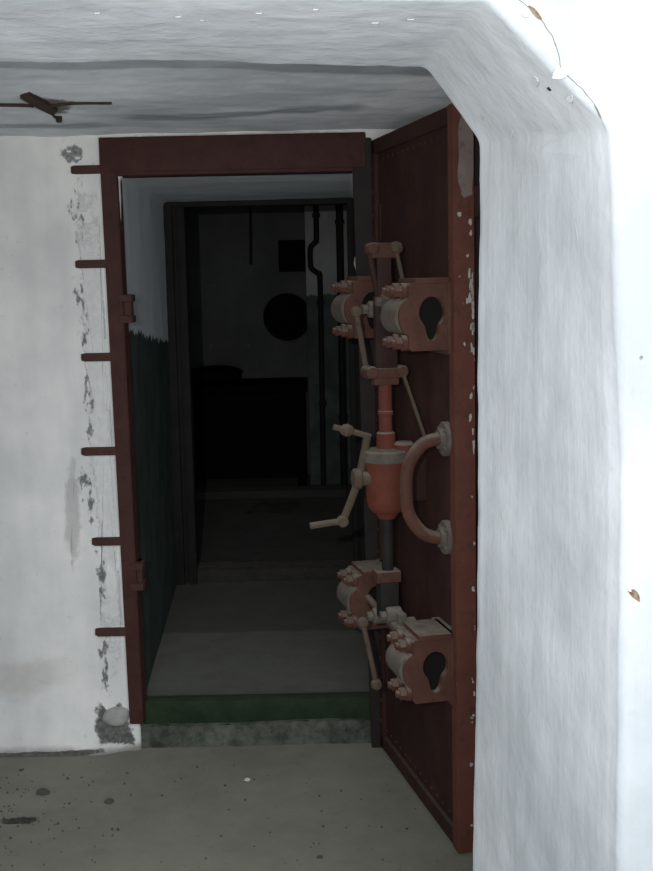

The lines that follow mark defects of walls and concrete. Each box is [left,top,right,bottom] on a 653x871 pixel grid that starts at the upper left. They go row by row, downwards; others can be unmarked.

crack [519,0,606,131]
peeling [62,145,82,163]
peeling [68,191,121,627]
peeling [98,641,115,690]